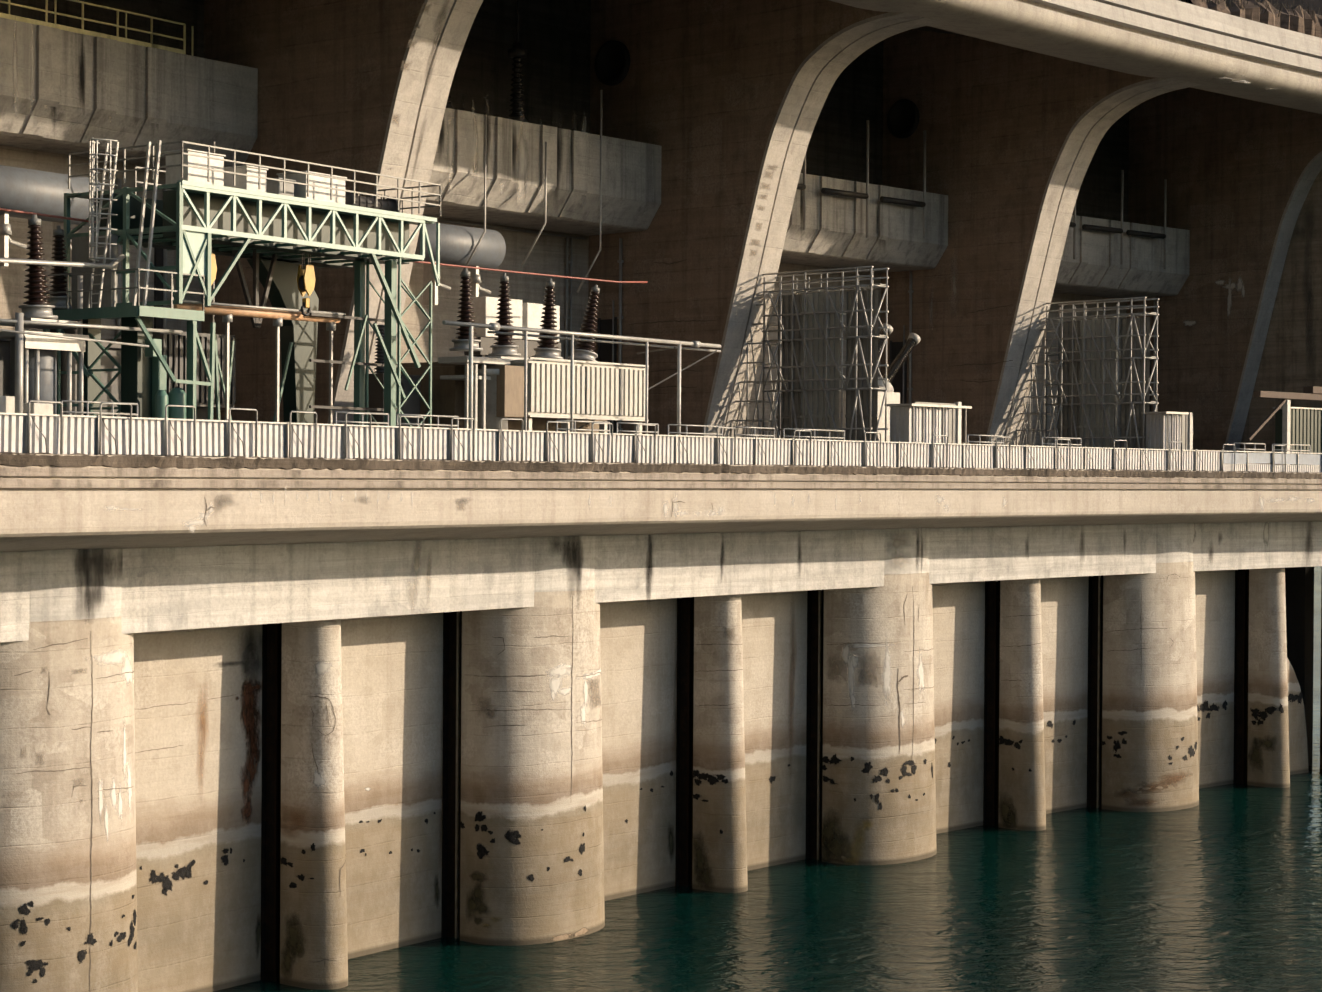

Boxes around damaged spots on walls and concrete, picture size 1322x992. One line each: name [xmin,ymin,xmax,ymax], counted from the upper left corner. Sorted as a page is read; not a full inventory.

leakage [79,554,123,610]
leakage [554,541,581,584]
crack [827,596,933,754]
peeling [1197,700,1228,721]
corrosion [236,681,262,823]
peeling [693,769,729,802]
peeling [823,754,951,810]
peeling [140,860,208,896]
peeling [461,811,521,859]
peeling [528,832,585,881]
peeling [12,901,50,983]
peeling [78,895,137,964]